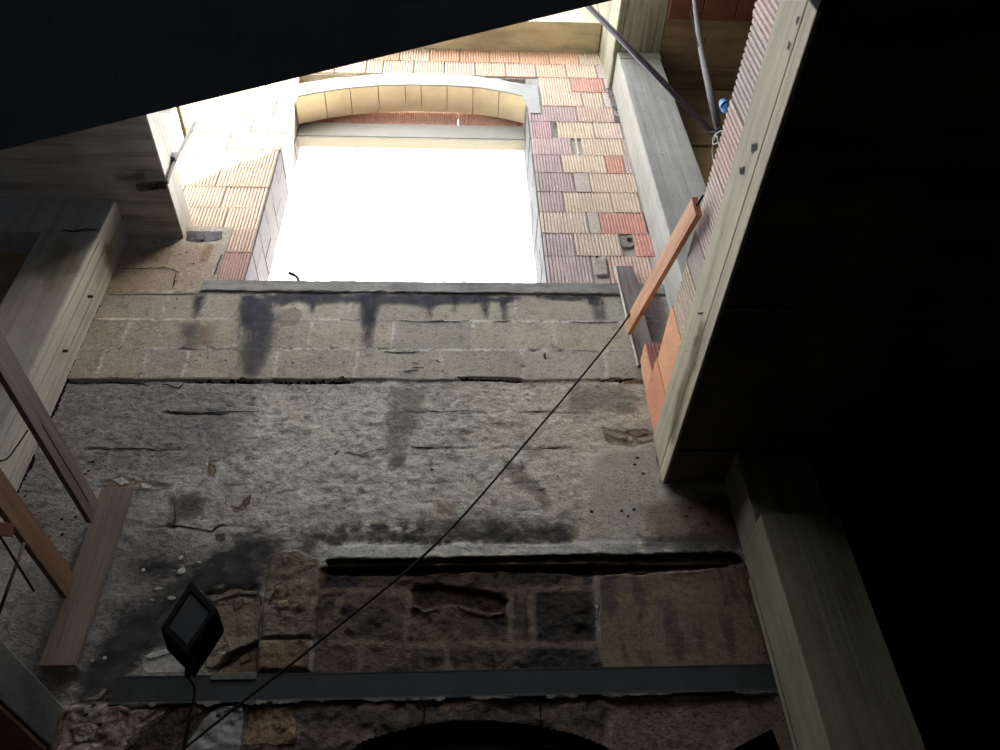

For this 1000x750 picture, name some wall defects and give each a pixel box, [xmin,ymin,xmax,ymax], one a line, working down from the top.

damp [185,296,204,338]
damp [241,294,519,371]
damp [537,295,604,319]
crack [17,267,351,502]
damp [391,387,420,464]
flaking render [602,427,654,475]
damp [131,555,175,579]
spalling [325,551,767,655]
damp [83,617,156,697]